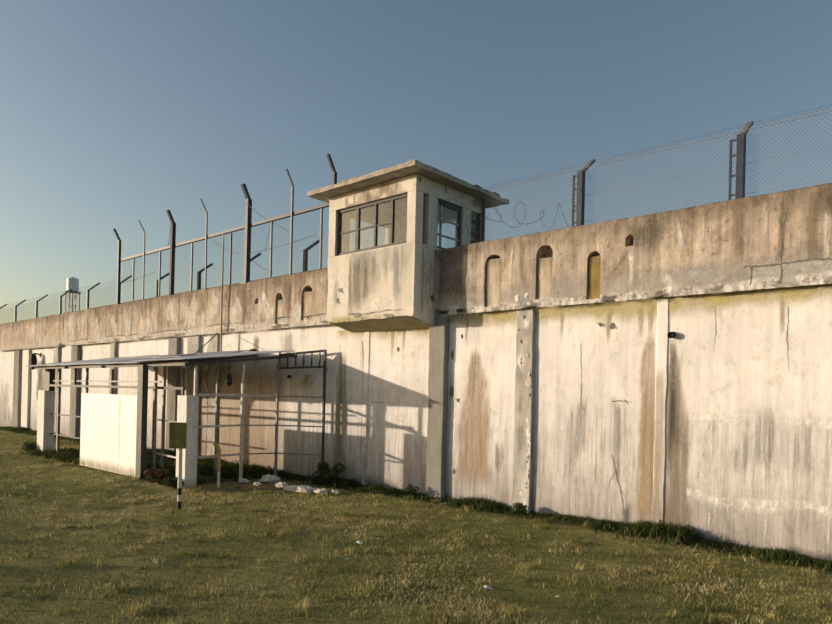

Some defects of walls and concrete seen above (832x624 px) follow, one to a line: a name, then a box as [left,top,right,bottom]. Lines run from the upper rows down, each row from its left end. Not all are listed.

damp [808,196,832,258]
damp [534,295,601,307]
damp [723,279,775,292]
damp [638,344,654,515]
damp [664,348,731,528]
damp [734,414,832,468]
damp [737,499,832,515]